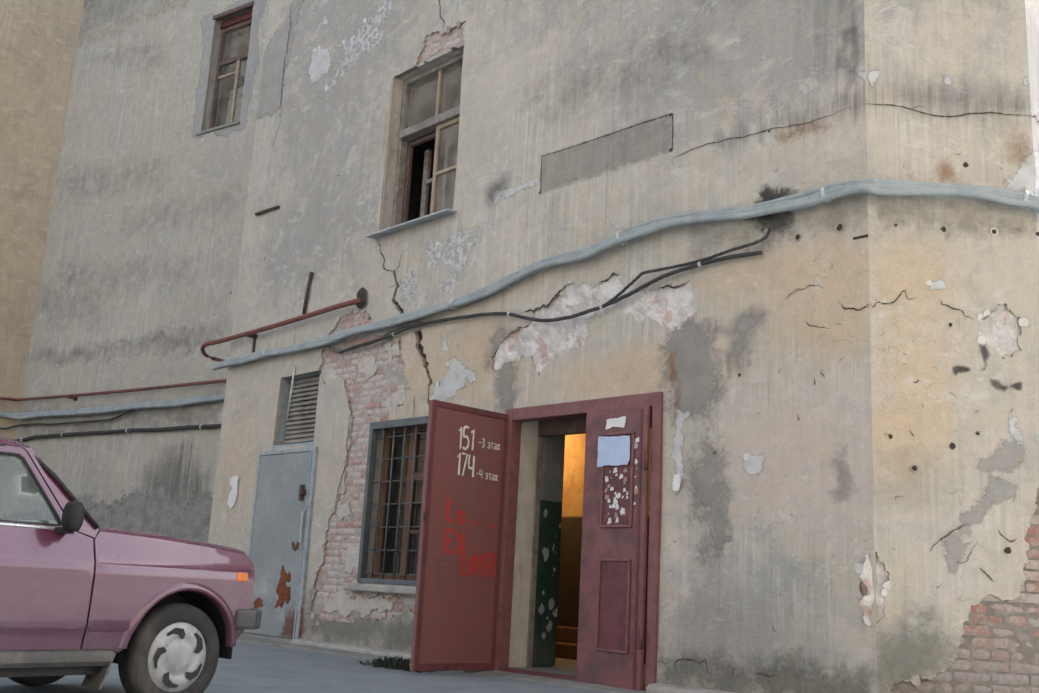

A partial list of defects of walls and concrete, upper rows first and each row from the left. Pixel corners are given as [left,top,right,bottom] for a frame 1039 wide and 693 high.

crack [674,103,1039,158]
crack [379,244,433,417]
spalling [493,274,698,375]
leakage [661,313,764,419]
crack [785,285,997,329]
spalling [977,304,1029,358]
flaking render [311,287,415,621]
leakage [689,437,732,562]
peeling [942,409,1026,573]
rust [254,565,304,638]
spalling [855,552,891,627]
flaking render [889,488,1039,693]